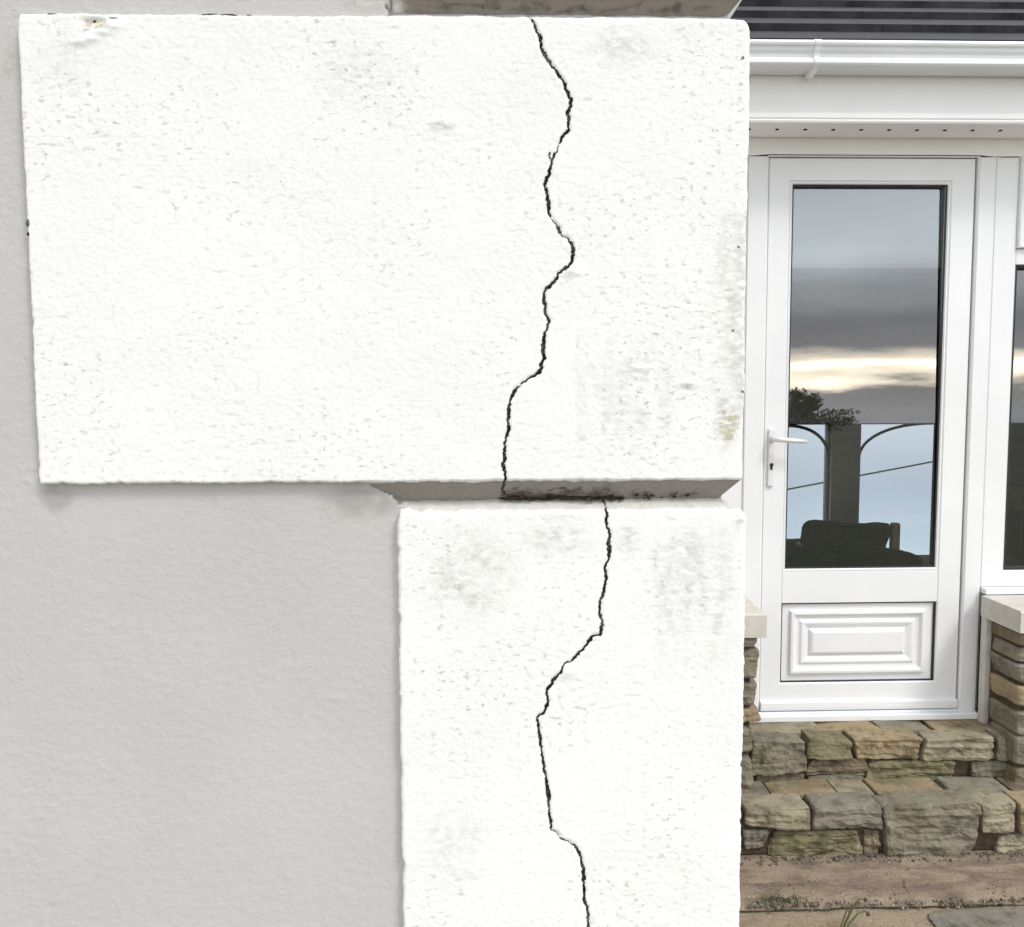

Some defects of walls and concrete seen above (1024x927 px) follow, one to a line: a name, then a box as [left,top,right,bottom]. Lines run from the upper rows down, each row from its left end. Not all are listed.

crack [501,17,575,496]
crack [536,500,612,927]